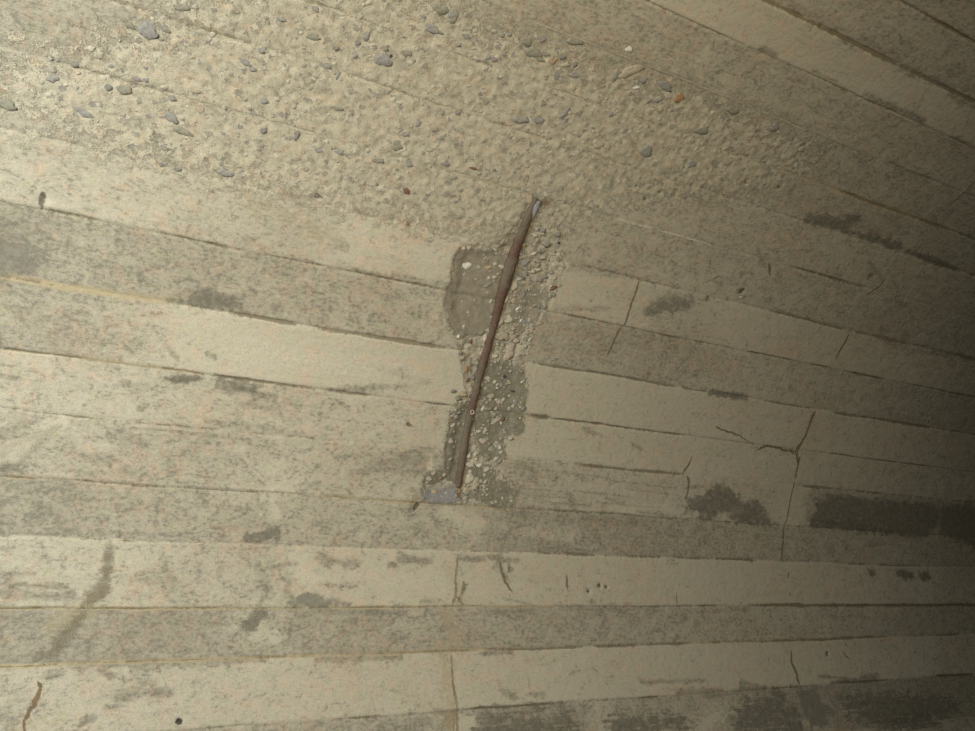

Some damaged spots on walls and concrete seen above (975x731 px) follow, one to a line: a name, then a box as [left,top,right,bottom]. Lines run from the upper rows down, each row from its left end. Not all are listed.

crack [605,281,639,355]
spalling [419,195,565,509]
crack [683,457,692,496]
leakage [685,486,775,526]
crack [716,411,816,595]
crack [790,652,800,688]
leakage [471,708,579,731]
leakage [603,710,689,731]
leakage [729,687,959,731]